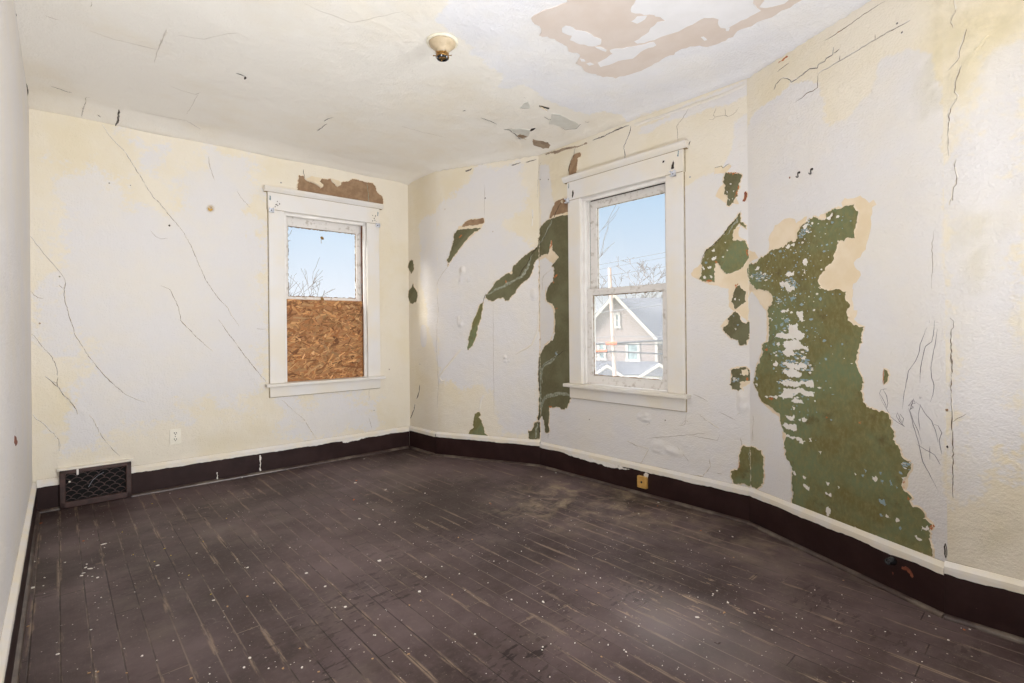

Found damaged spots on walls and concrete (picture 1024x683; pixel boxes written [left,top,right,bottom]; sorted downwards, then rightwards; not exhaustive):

peeling [519,102,579,130]
peeling [531,0,801,78]
crack [774,20,910,101]
crack [947,0,967,205]
crack [32,334,120,456]
crack [30,236,145,402]
crack [51,86,265,380]
peeling [296,169,384,216]
peeling [446,218,485,266]
peeling [467,128,587,440]
peeling [691,164,935,557]